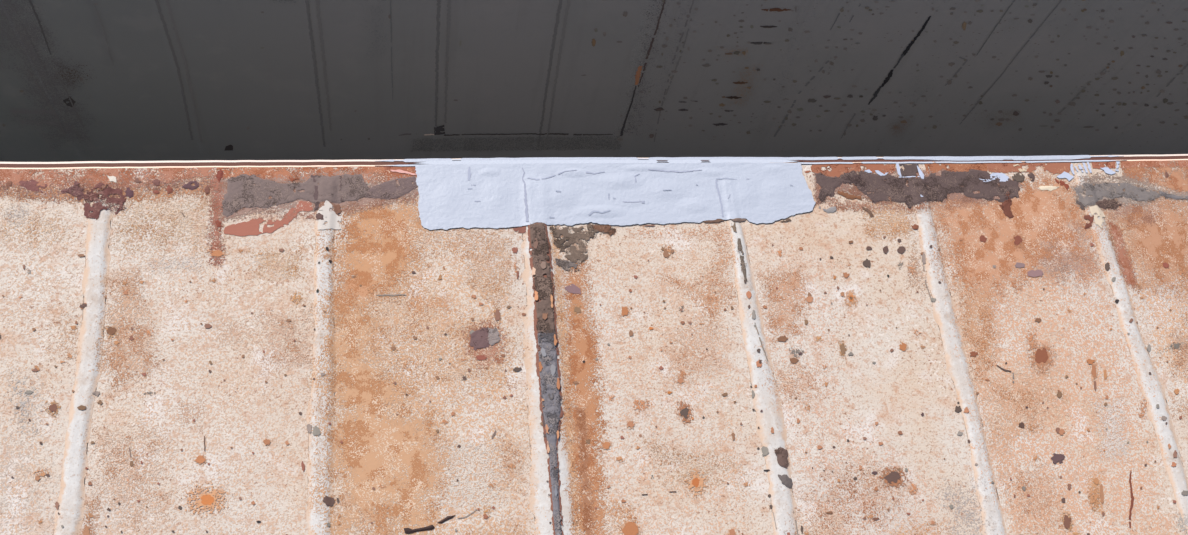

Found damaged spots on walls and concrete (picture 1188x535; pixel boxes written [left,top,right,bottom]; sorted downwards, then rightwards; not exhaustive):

crack [868,16,931,105]
peeling [6,169,417,227]
peeling [815,163,1188,229]
spalling [862,239,906,267]
peeling [528,222,616,535]
corrosion [0,160,1188,535]